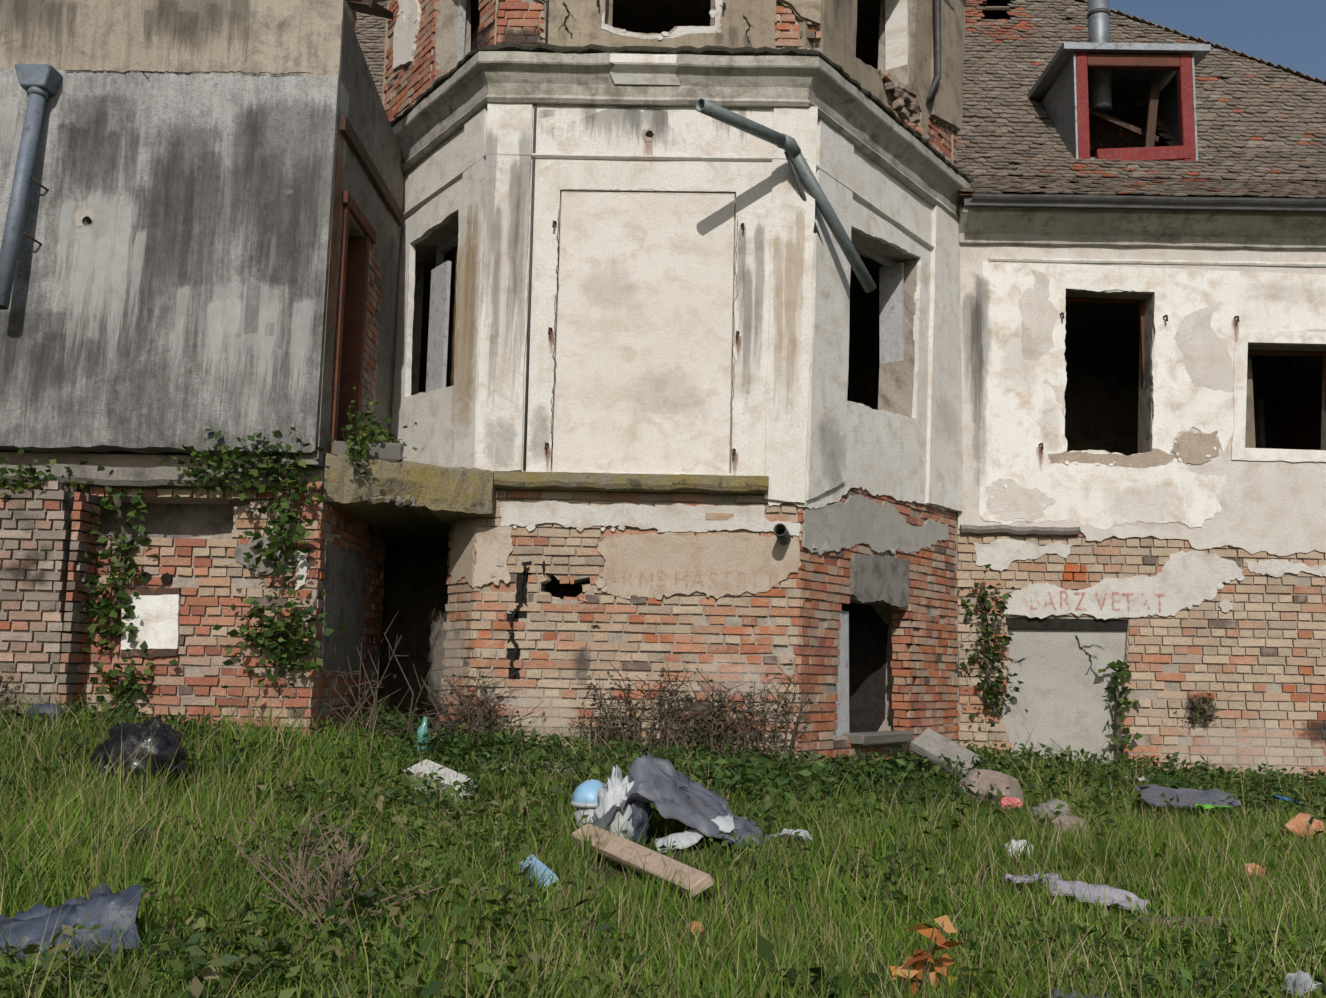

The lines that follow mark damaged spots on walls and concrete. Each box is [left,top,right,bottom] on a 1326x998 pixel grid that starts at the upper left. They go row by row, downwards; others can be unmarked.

flaking render [393,0,422,70]
spalling [497,0,546,44]
spalling [773,6,821,52]
spalling [878,69,958,163]
spalling [1171,431,1220,465]
spalling [985,479,1055,522]
spalling [1062,564,1087,581]
crack [507,561,545,679]
spalling [489,561,607,679]